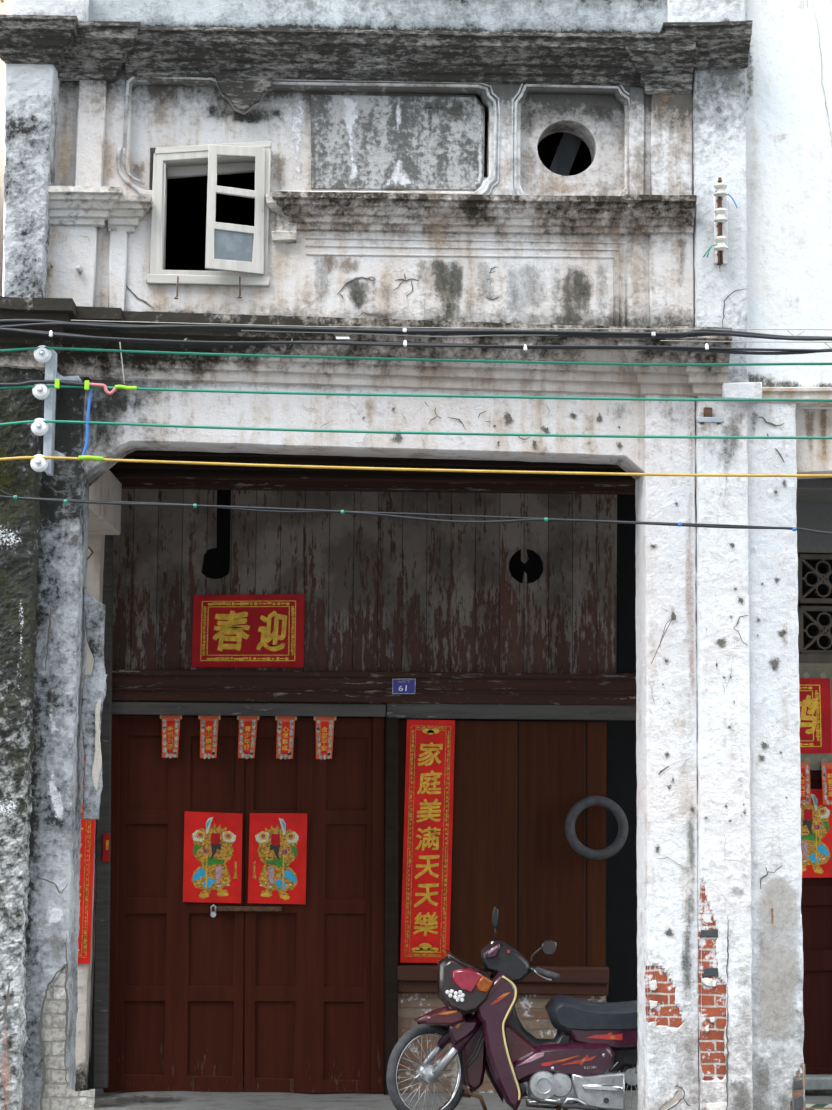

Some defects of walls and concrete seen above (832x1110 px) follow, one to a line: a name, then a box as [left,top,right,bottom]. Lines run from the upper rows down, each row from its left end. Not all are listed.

crack [802,0,832,145]
water stain [342,97,360,179]
water stain [385,160,425,188]
water stain [424,100,463,138]
water stain [473,107,482,186]
water stain [554,268,605,325]
water stain [807,410,826,443]
spalling [644,966,683,1028]
spalling [697,879,736,1089]
spalling [42,968,95,1110]
spalling [700,1099,727,1110]